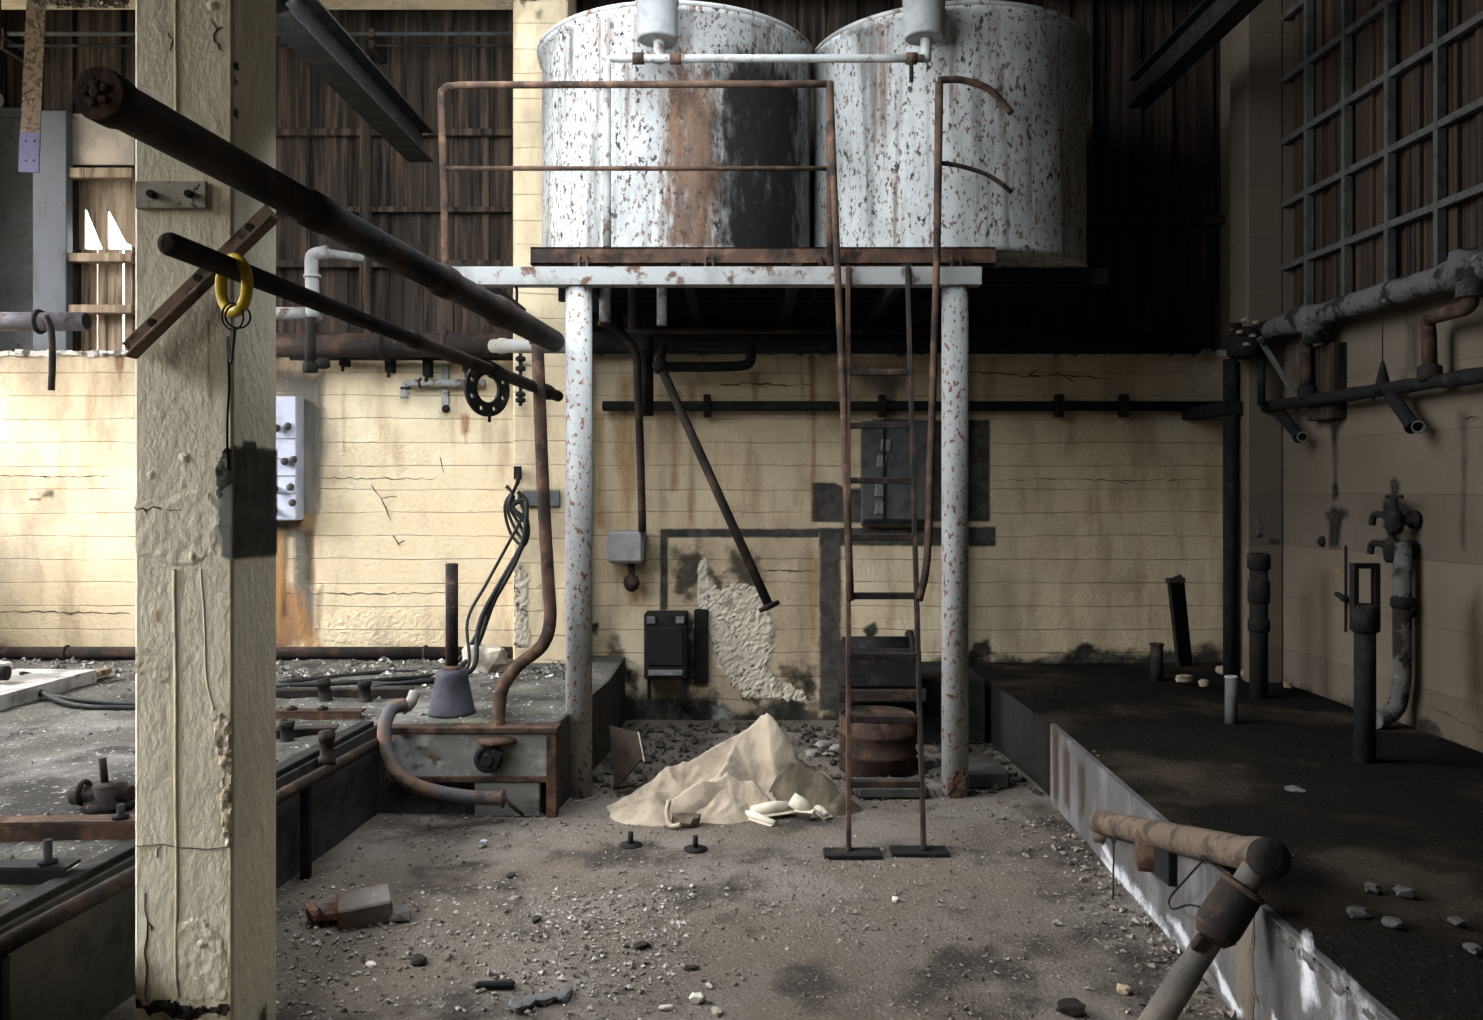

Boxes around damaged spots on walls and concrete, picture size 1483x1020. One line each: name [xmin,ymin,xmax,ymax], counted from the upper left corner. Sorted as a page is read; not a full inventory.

rust [276,535,319,647]
flaking render [693,557,811,703]
peeling [135,919,230,1020]